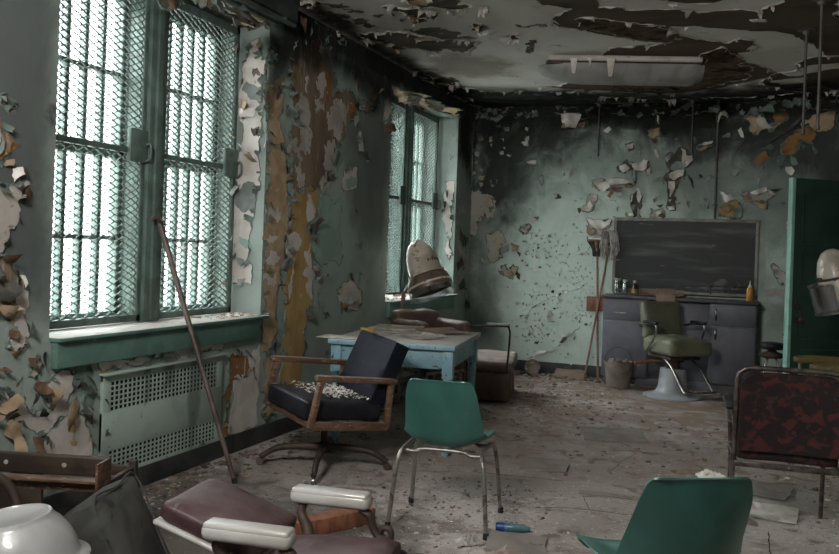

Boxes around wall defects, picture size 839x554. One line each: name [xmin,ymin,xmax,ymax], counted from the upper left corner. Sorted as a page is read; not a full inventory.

peeling [0,180,224,456]
peeling [156,0,839,423]
water stain [270,0,839,208]